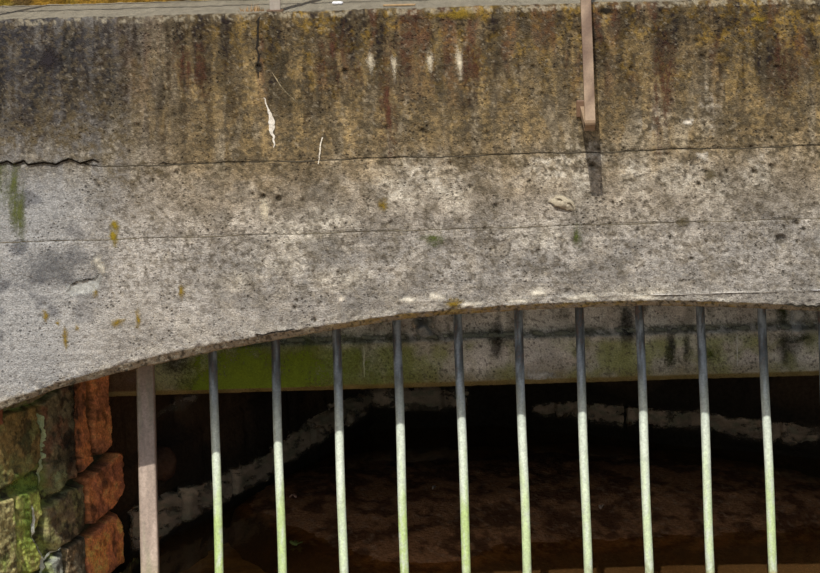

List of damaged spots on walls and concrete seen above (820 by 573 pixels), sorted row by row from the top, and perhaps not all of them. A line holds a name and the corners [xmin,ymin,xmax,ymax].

crack [0,144,820,167]
leakage [667,334,675,365]
leakage [36,413,46,485]
leakage [30,506,60,573]